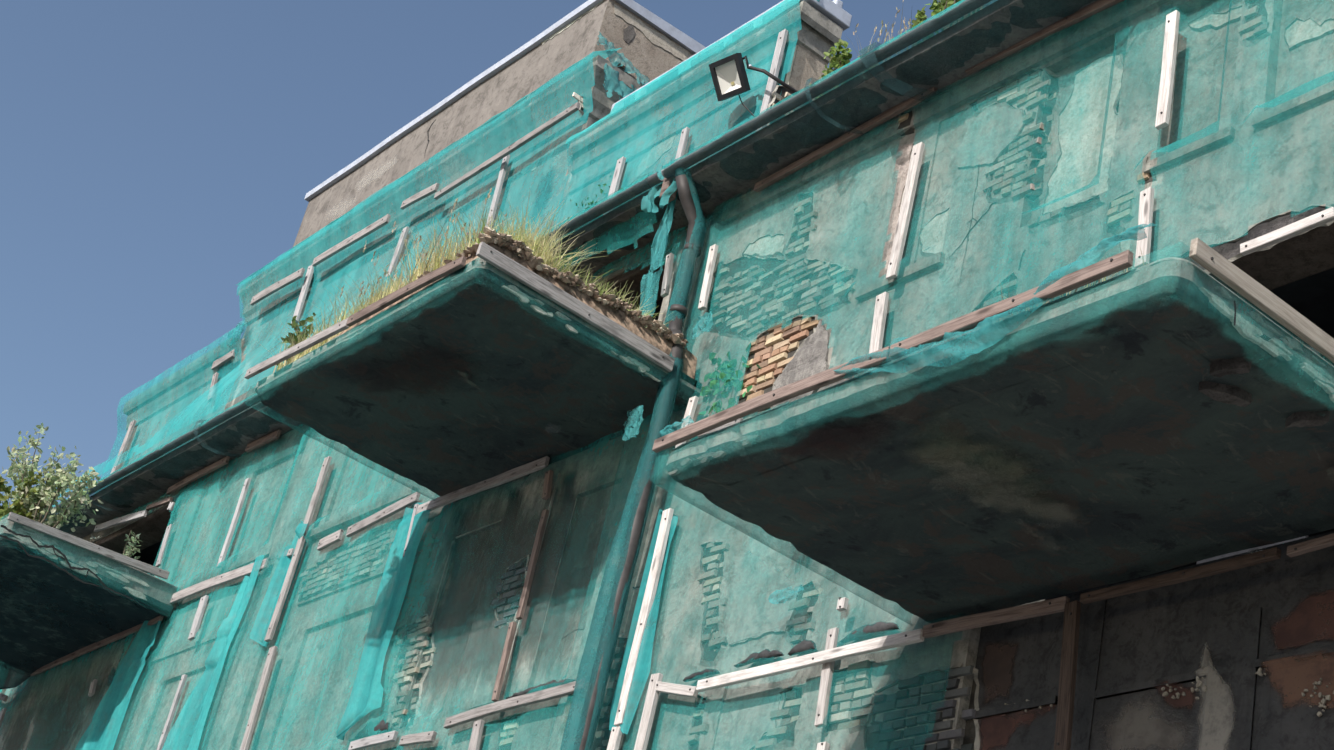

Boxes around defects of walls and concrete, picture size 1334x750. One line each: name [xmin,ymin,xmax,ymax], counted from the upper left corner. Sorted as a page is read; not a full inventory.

flaking render [1188,0,1334,51]
peeling [969,54,1157,285]
flaking render [703,190,858,417]
leakage [918,437,1071,519]
flaking render [491,555,529,629]
leakage [421,473,607,693]
flaking render [390,612,436,733]
flaking render [824,658,980,750]
peeling [1255,651,1334,717]